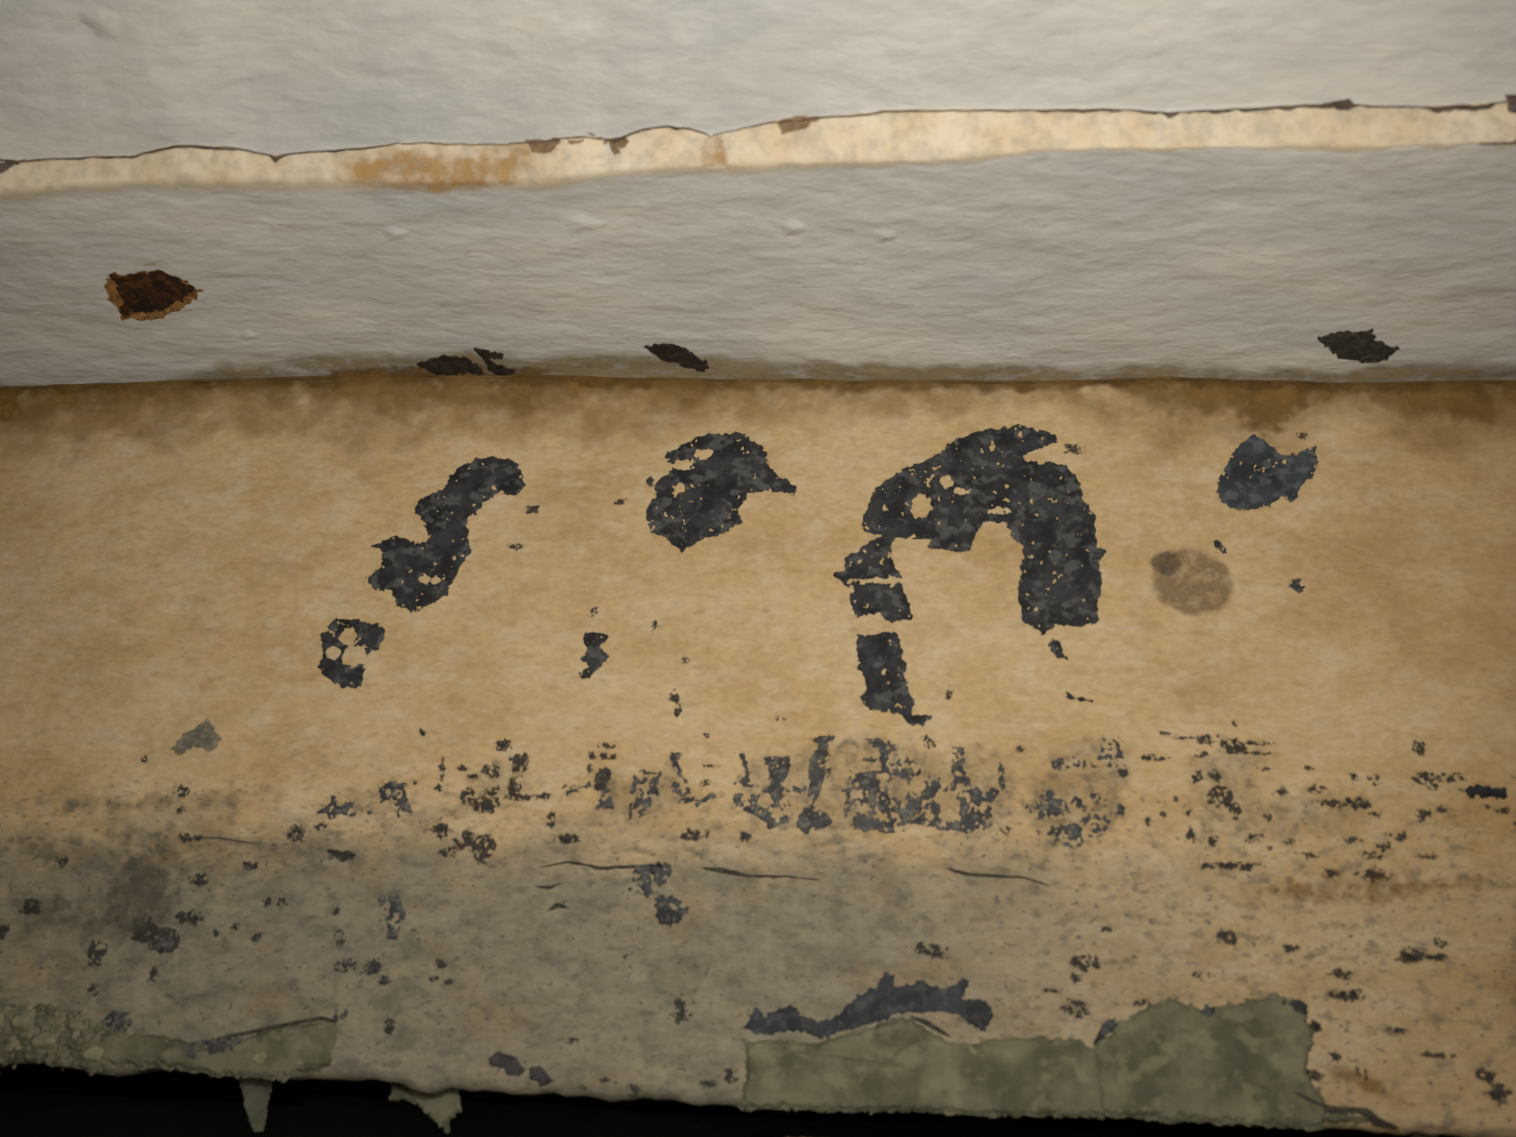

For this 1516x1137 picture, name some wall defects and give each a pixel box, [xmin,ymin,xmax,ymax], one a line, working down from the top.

crack [0,100,1516,163]
rust [104,269,203,321]
peeling [416,348,515,376]
peeling [644,343,709,372]
peeling [1317,329,1400,364]
peeling [1216,432,1319,510]
peeling [365,456,540,613]
water stain [1152,540,1228,613]
water stain [1288,578,1305,593]
peeling [318,618,385,689]
peeling [434,424,1106,845]
peeling [745,972,993,1040]